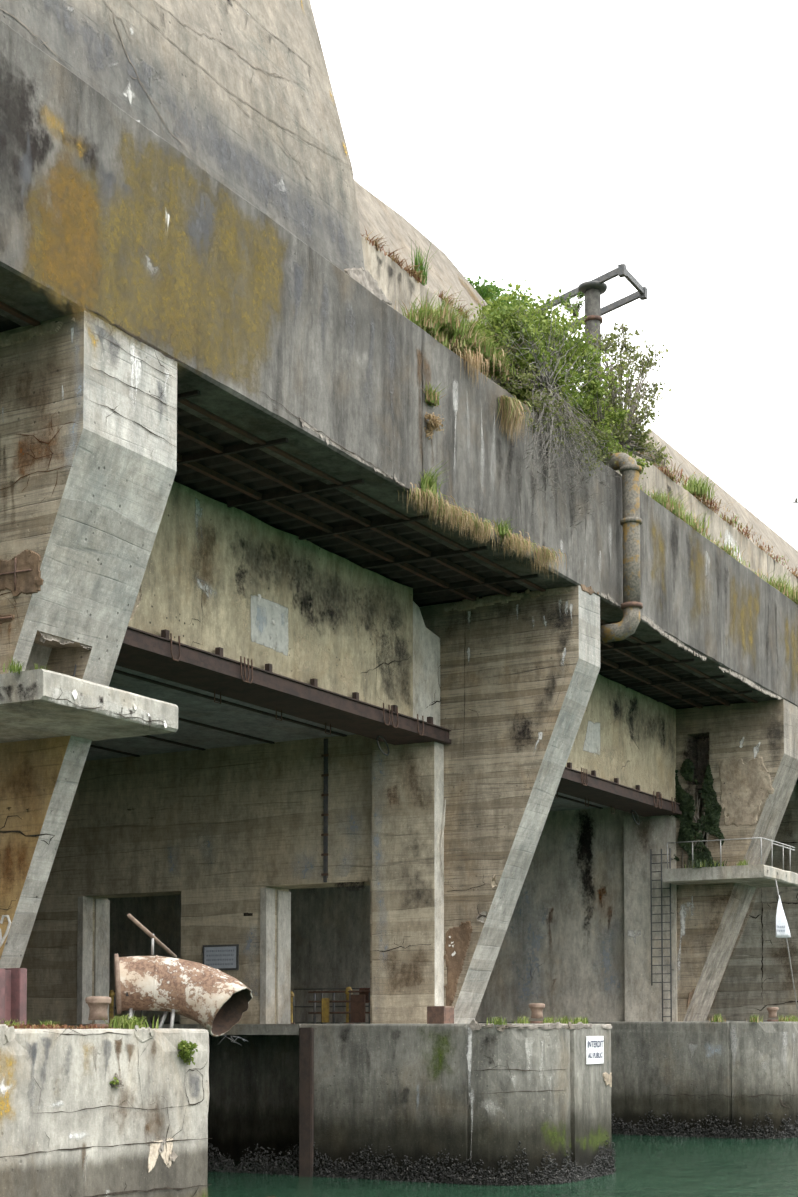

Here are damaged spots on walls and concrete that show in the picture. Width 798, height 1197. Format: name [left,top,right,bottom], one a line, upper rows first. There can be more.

water stain [0,57,49,204]
crack [101,0,350,215]
spalling [0,549,44,597]
peeling [251,594,289,656]
water stain [233,543,409,704]
crack [0,815,55,845]
water stain [577,813,594,926]
spalling [444,921,473,1006]
crack [749,888,798,1011]